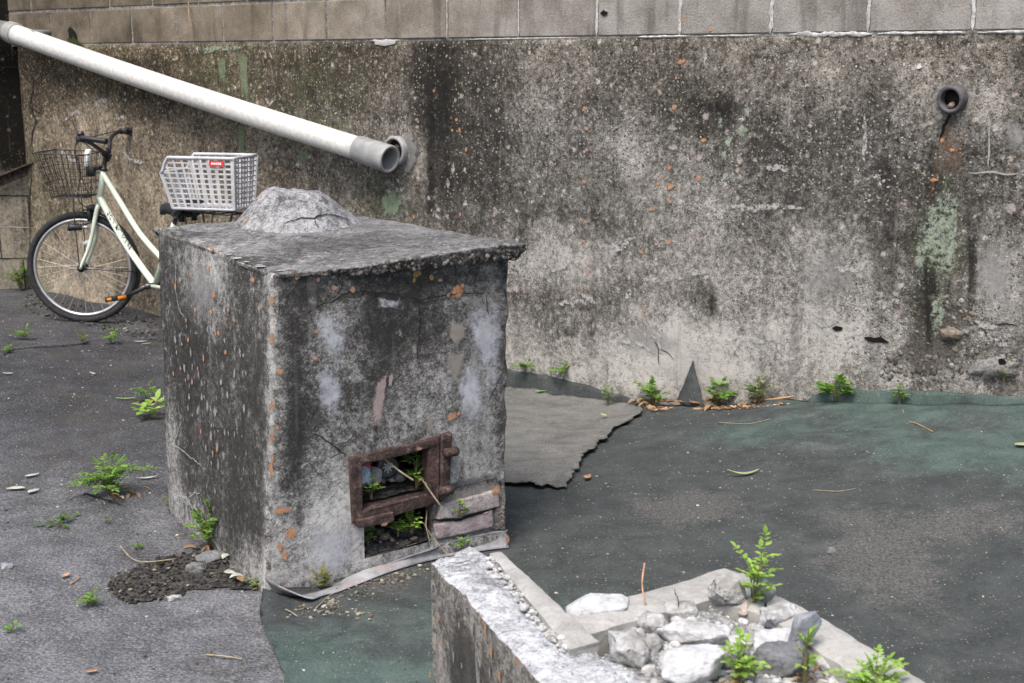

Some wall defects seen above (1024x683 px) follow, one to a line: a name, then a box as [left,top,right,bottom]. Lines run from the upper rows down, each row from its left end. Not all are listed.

water stain [426,89,461,213]
crack [281,213,345,227]
water stain [915,198,959,338]
peeling [373,374,393,421]